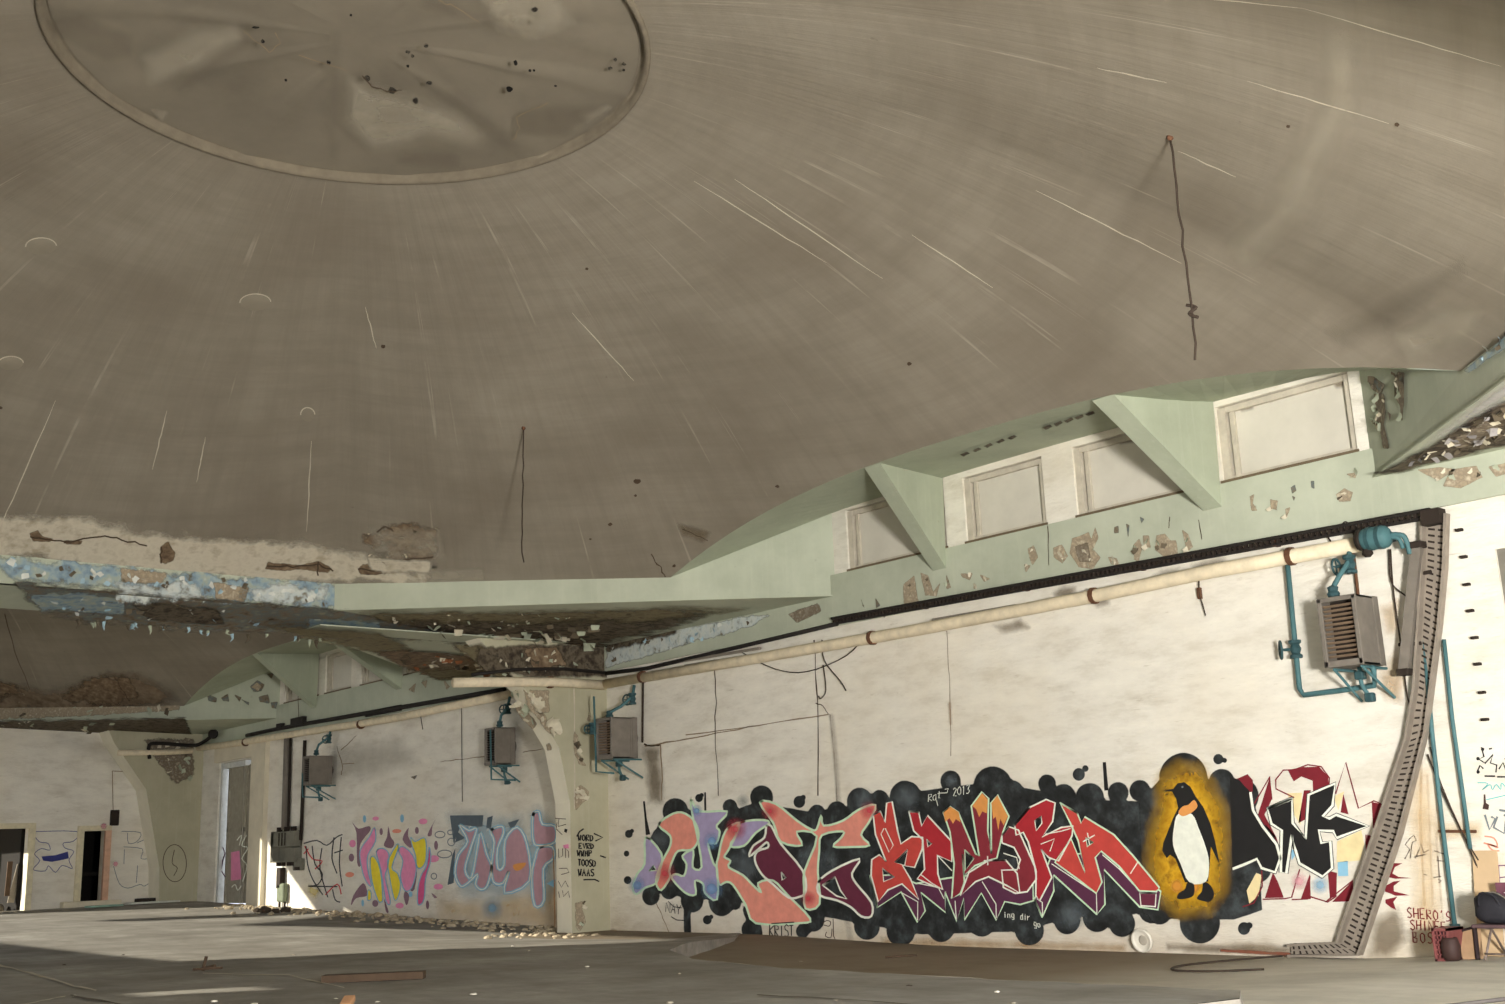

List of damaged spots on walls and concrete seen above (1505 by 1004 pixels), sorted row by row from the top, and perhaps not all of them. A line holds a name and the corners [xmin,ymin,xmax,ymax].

peeling [1367,371,1404,449]
peeling [1375,403,1505,488]
peeling [1250,481,1314,519]
peeling [1336,468,1357,502]
peeling [1024,517,1193,572]
peeling [0,516,768,766]
peeling [789,604,821,622]
peeling [0,704,195,783]